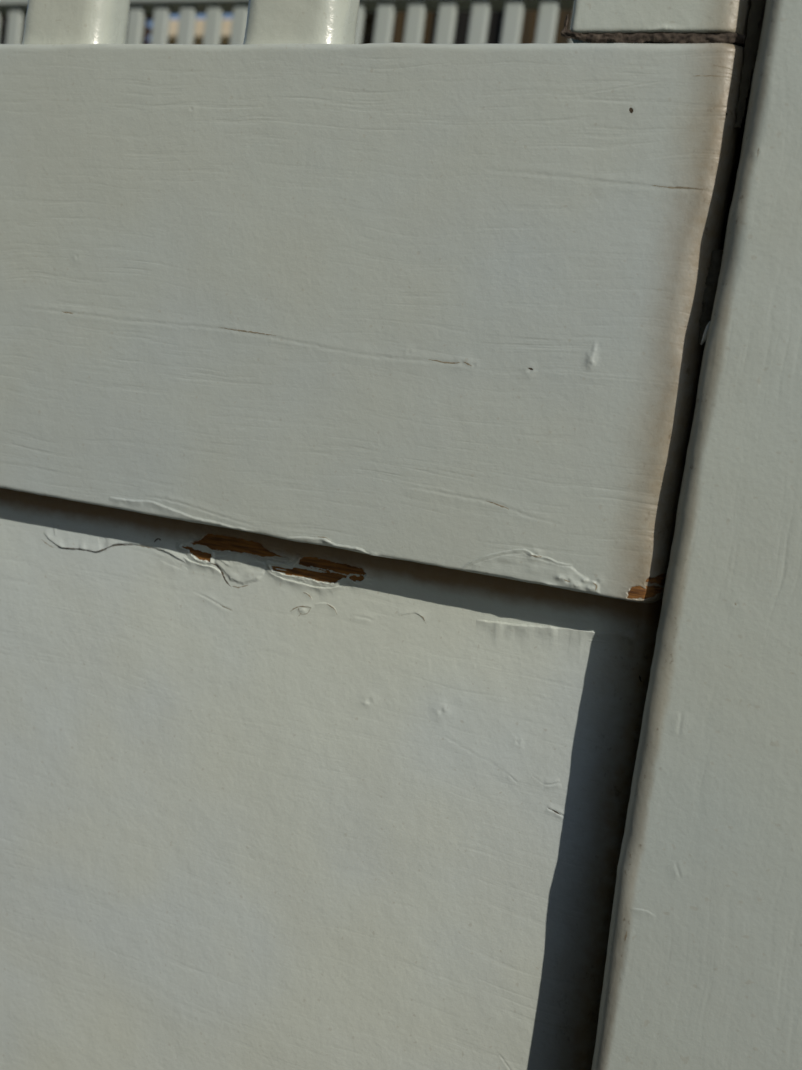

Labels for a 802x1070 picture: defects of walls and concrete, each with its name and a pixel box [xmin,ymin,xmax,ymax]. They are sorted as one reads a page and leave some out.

crack [41,515,192,571]
peeling [108,488,397,603]
peeling [460,541,666,603]